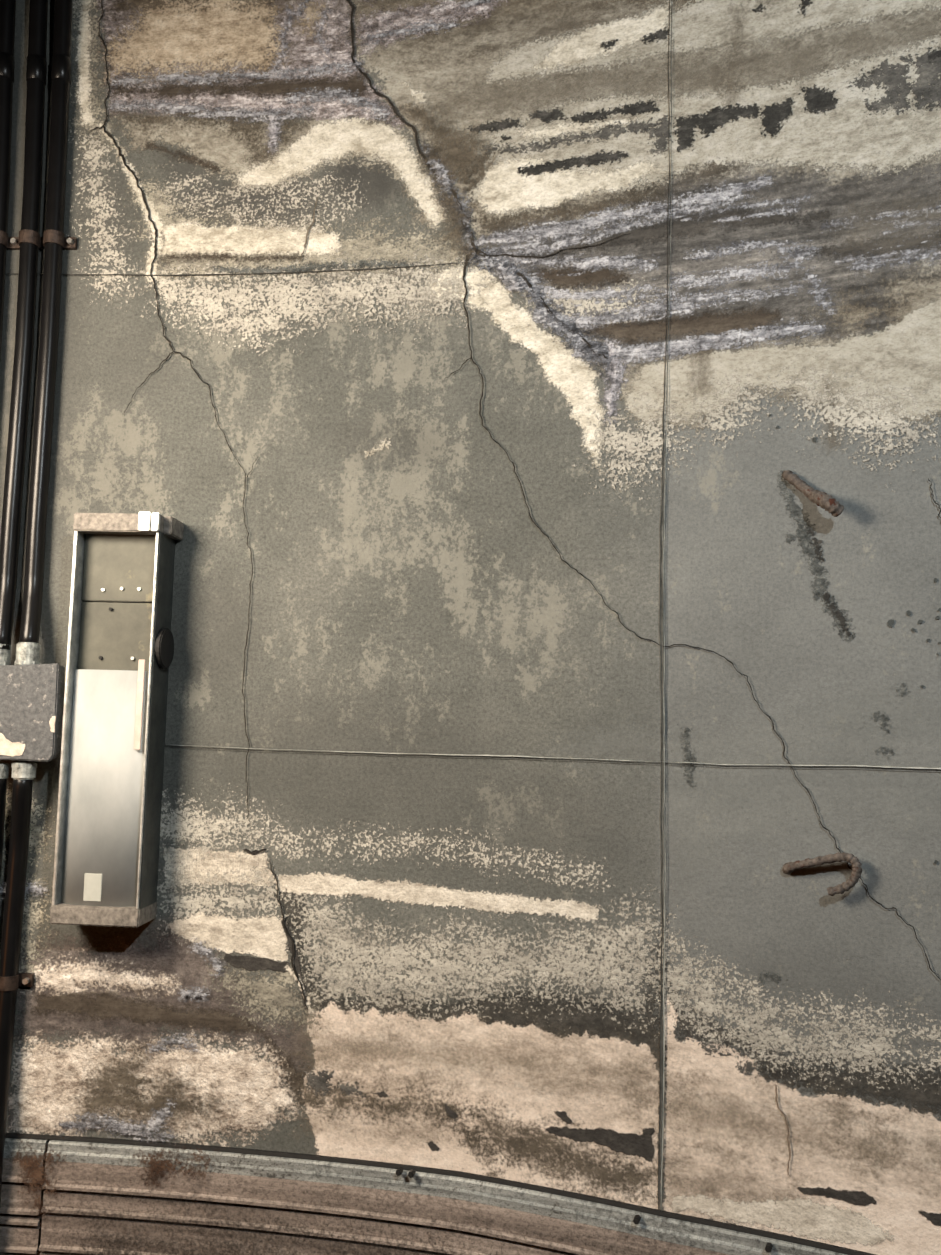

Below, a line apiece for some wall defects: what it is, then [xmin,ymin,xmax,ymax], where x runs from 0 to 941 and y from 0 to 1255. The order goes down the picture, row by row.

crack [90,0,258,819]
crack [299,197,318,263]
damp [65,0,941,502]
crack [347,0,941,980]
damp [0,783,13,899]
crack [243,849,308,1010]
damp [7,783,941,1147]